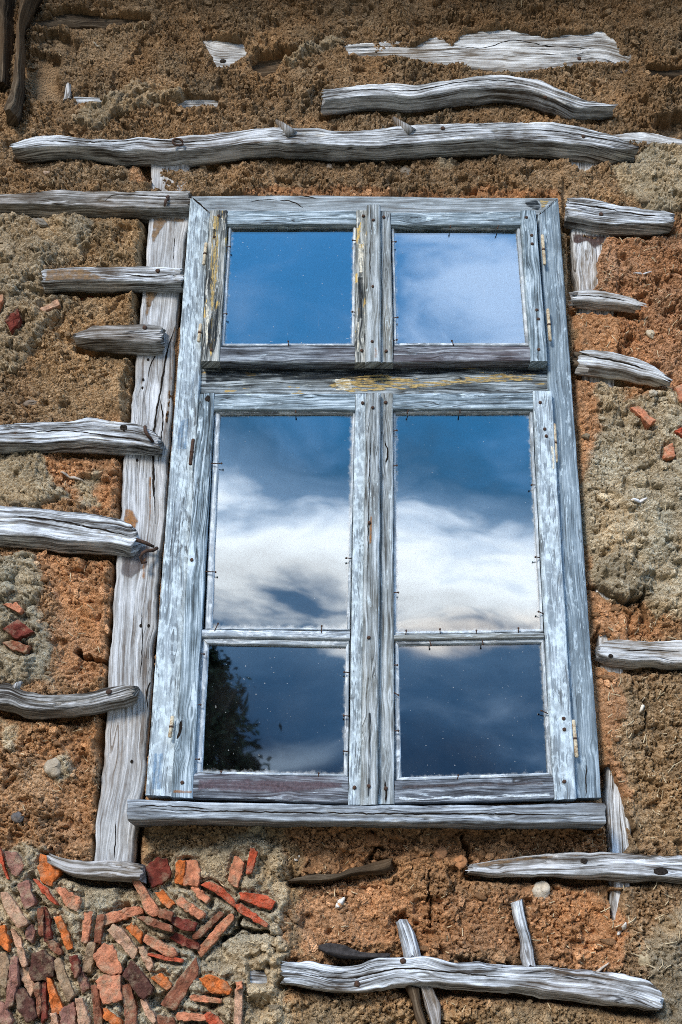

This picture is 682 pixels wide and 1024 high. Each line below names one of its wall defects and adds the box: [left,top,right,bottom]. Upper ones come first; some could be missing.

peeling [206,368,539,392]
crack [425,869,434,928]